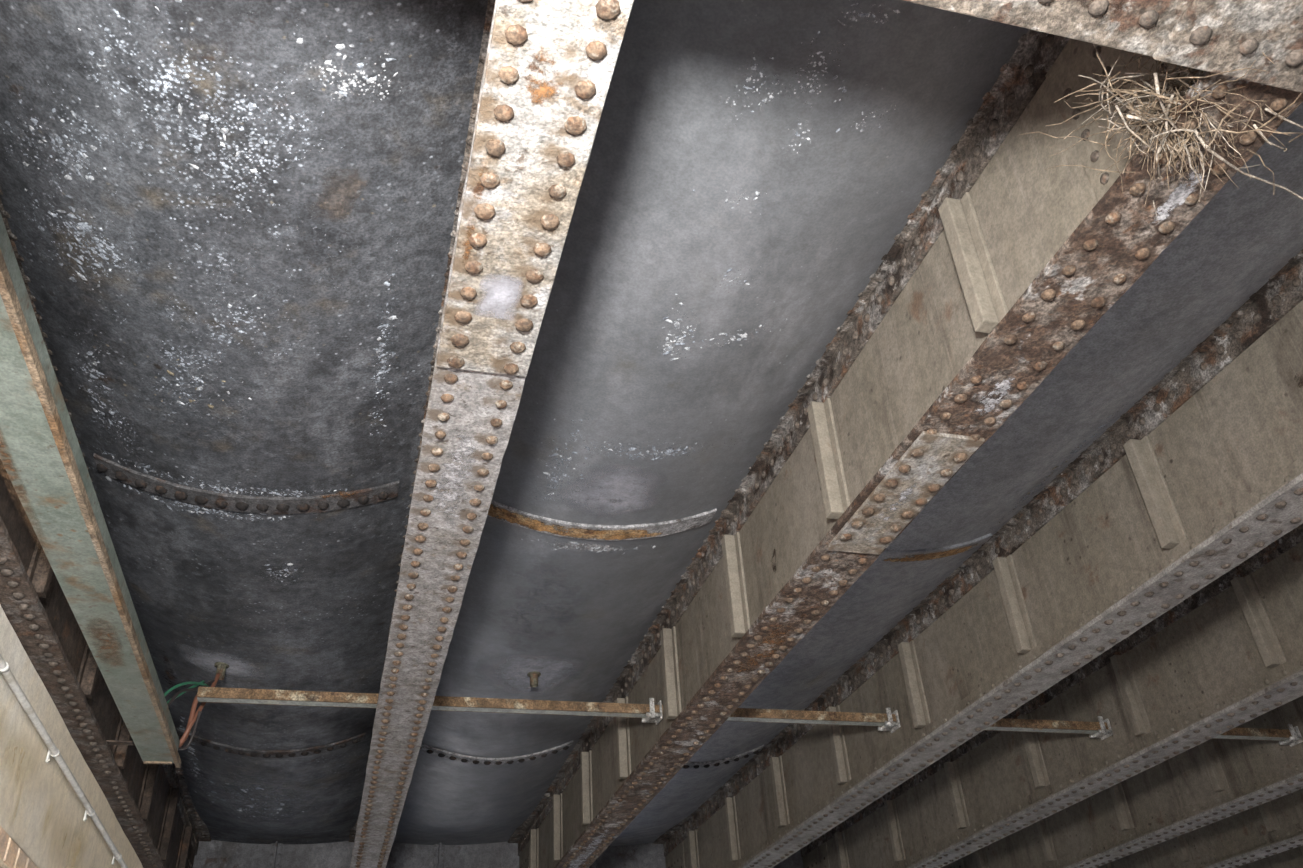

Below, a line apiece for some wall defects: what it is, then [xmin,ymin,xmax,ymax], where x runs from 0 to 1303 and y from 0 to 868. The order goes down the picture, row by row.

rust [905,167,964,258]
rust [462,216,476,263]
rust [0,437,29,511]
rust [487,504,662,540]
rust [883,544,977,562]